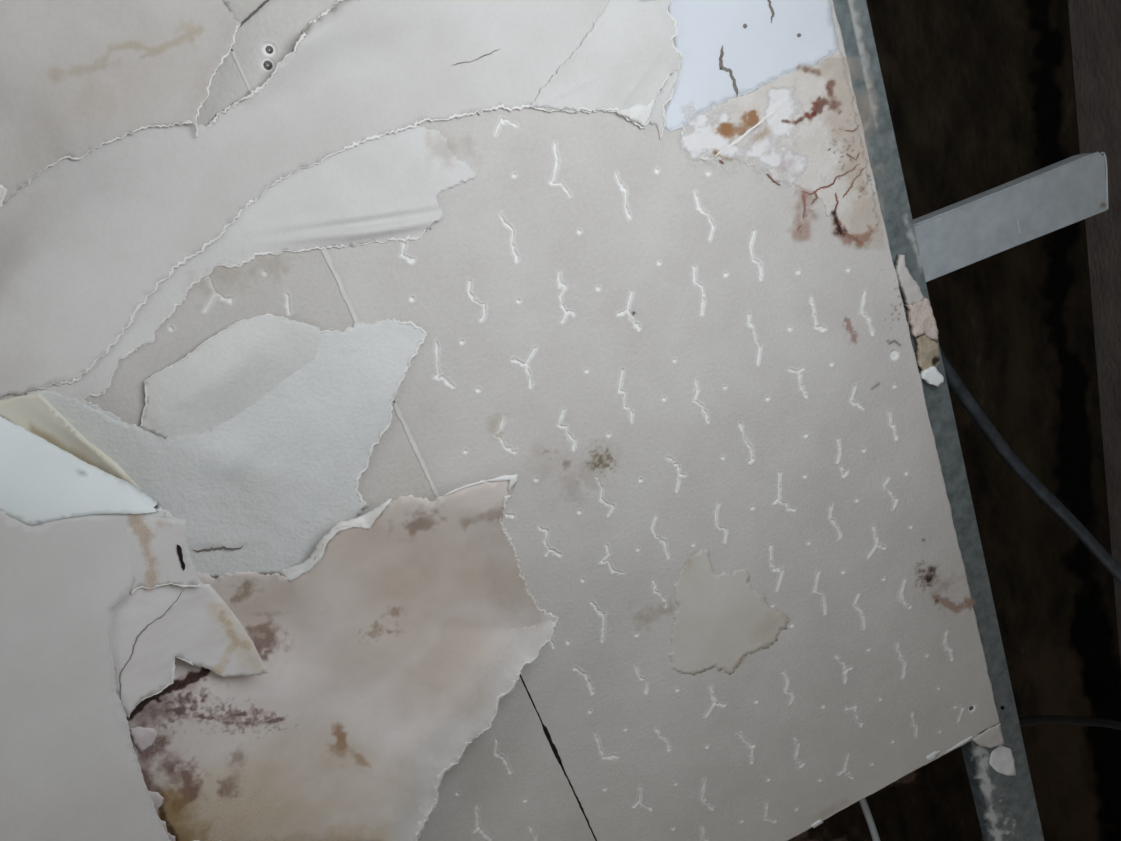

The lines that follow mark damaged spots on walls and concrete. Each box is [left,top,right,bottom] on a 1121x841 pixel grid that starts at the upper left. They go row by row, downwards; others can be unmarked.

crack [743,0,775,28]
peeling [616,98,655,127]
crack [719,46,738,96]
rust [717,110,759,138]
peeling [681,49,880,239]
rust [782,67,841,124]
crack [767,127,865,242]
rust [833,220,873,247]
leakage [587,449,613,469]
leakage [247,622,275,660]
leakage [126,667,284,841]
crack [520,675,597,841]